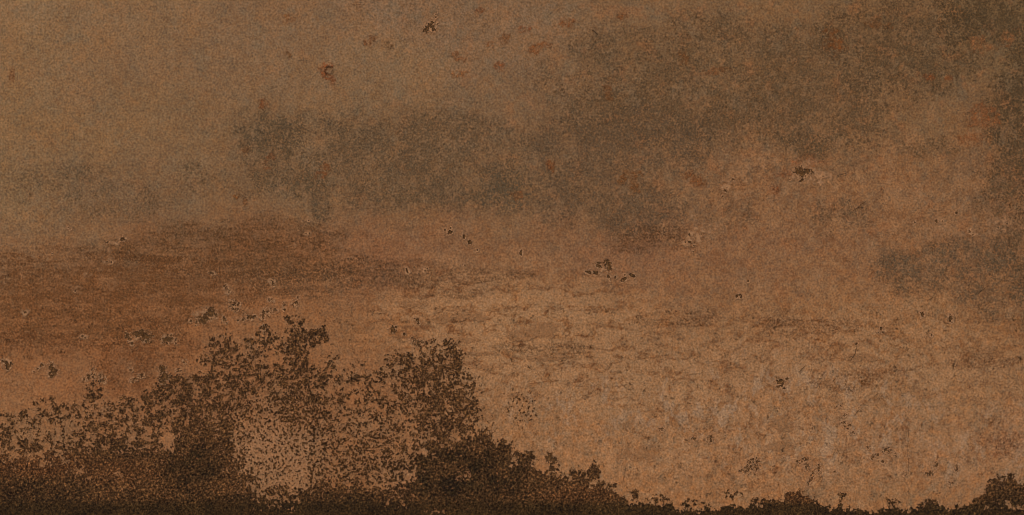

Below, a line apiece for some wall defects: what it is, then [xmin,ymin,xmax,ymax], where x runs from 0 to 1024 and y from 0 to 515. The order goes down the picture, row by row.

spalling [789,160,832,186]
spalling [583,259,637,283]
rust [0,224,452,391]